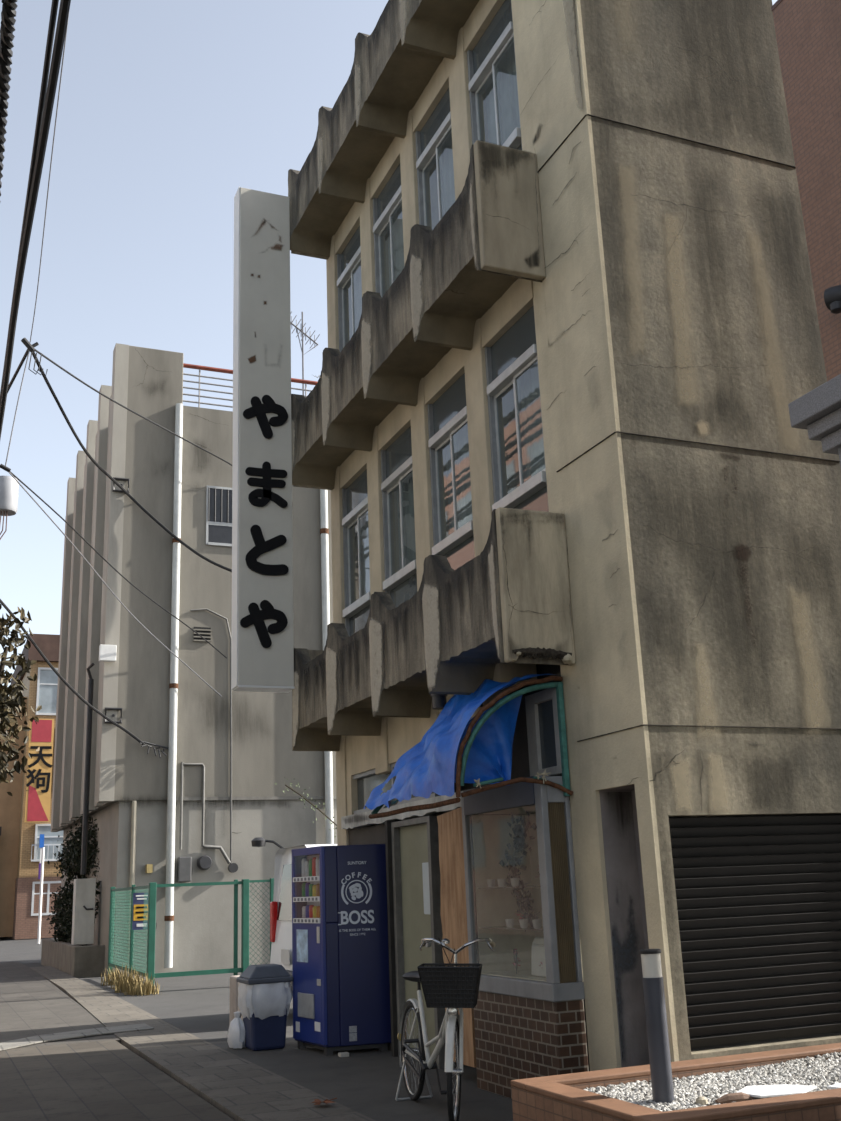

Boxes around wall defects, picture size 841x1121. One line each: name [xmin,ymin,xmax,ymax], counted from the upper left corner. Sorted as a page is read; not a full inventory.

leakage [480,143,520,177]
leakage [525,251,539,267]
leakage [612,902,637,1062]